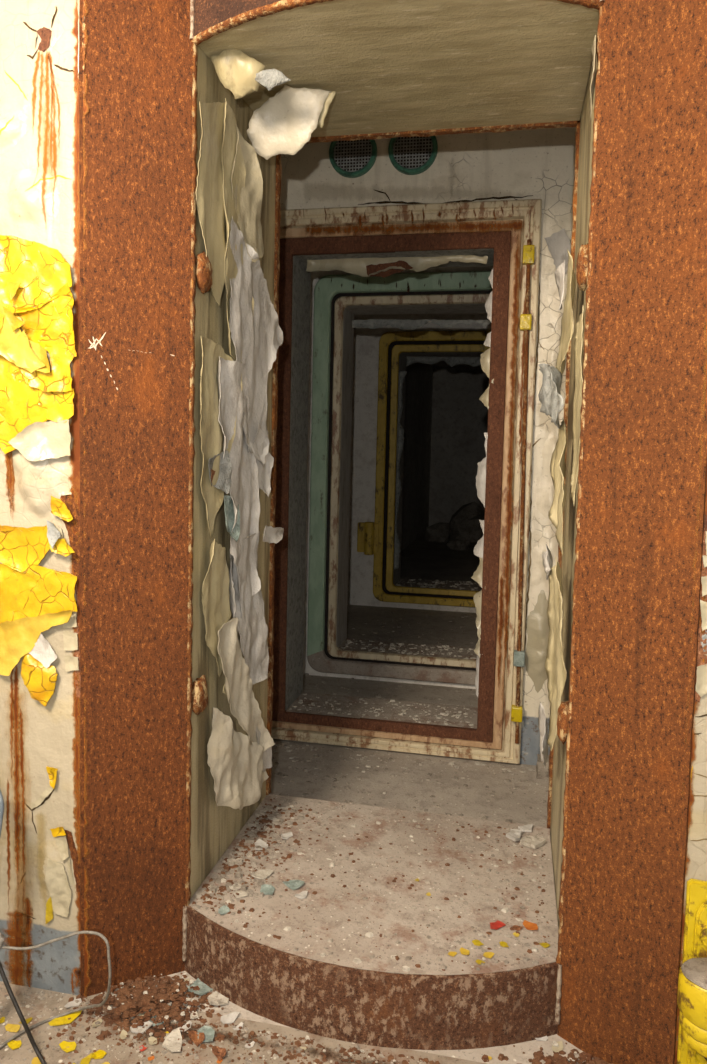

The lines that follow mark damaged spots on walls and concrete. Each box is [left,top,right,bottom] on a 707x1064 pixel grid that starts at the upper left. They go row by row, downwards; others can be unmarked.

rust [32,52,60,222]
peeling [0,235,77,461]
peeling [0,489,81,707]
rust [68,0,91,998]
peeling [196,49,336,810]
peeling [306,255,494,570]
peeling [471,520,484,697]
peeling [538,229,584,768]
rust [682,701,698,833]